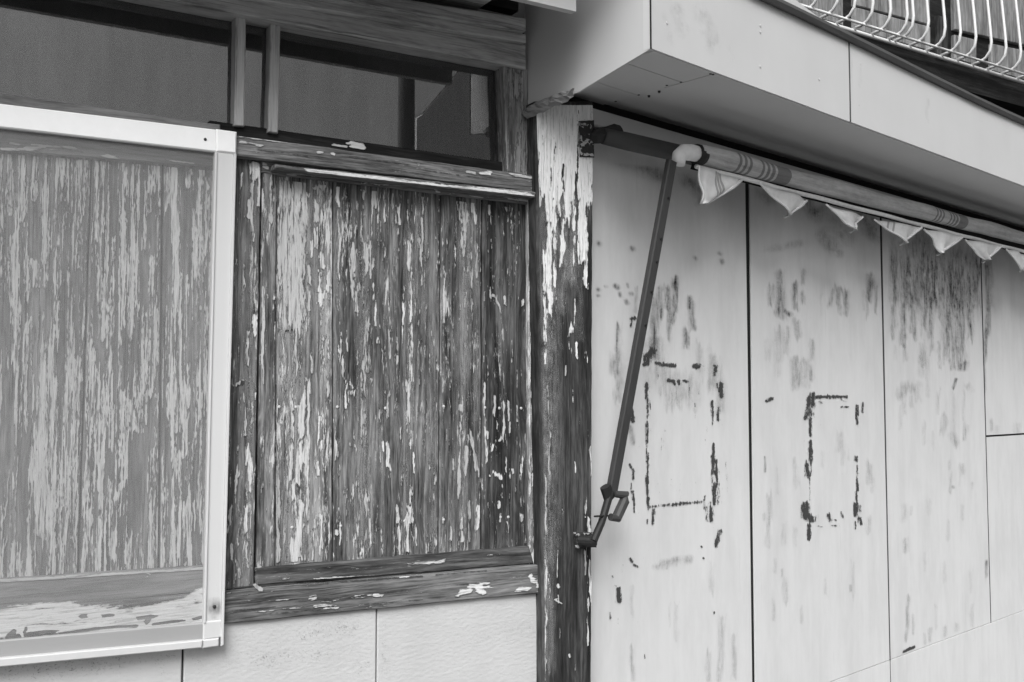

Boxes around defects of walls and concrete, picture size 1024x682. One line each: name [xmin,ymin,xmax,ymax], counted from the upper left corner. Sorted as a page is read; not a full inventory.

peeling [0,142,213,582]
peeling [225,68,593,682]
leakage [893,242,980,337]
peeling [0,587,203,639]